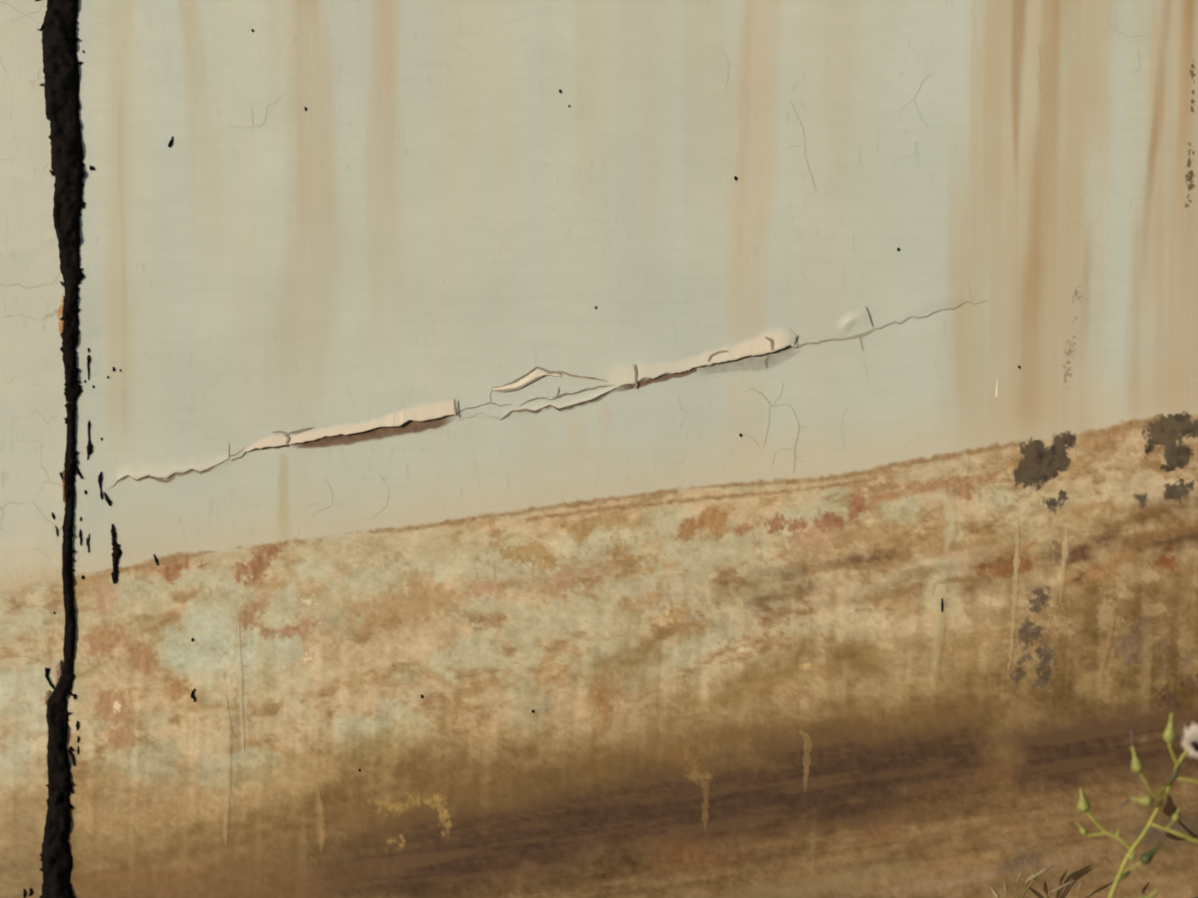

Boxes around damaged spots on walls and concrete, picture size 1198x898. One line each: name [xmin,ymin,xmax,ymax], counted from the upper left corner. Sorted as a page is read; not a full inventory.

rust [342,0,1198,576]
damp [720,370,774,482]
rust [79,536,475,759]
rust [579,680,626,734]
damp [70,397,1198,898]